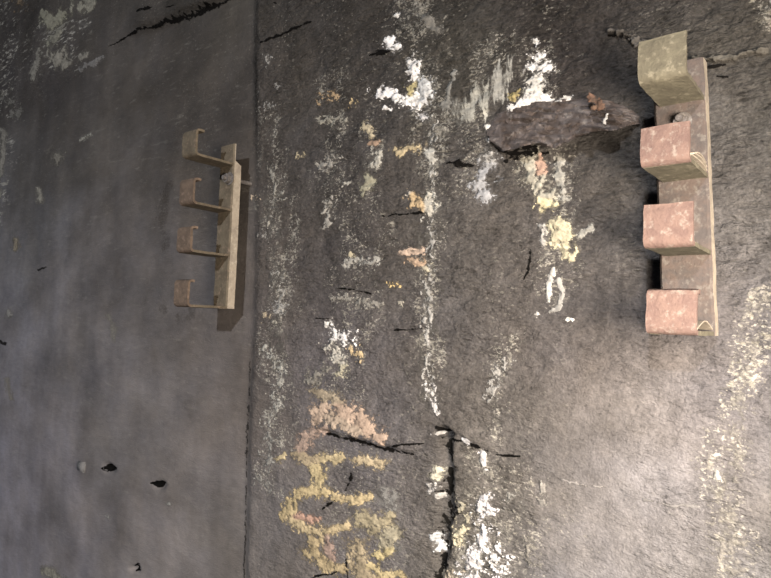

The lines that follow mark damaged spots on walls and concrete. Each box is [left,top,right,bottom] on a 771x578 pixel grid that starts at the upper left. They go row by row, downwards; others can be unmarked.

crack [112,0,228,45]
damp [382,35,402,51]
crack [707,64,729,78]
damp [315,90,358,127]
damp [341,119,384,198]
damp [319,195,338,230]
damp [367,38,574,416]
damp [341,251,381,269]
damp [329,292,385,311]
crack [322,426,521,578]
damp [426,450,536,578]
crack [312,559,348,578]